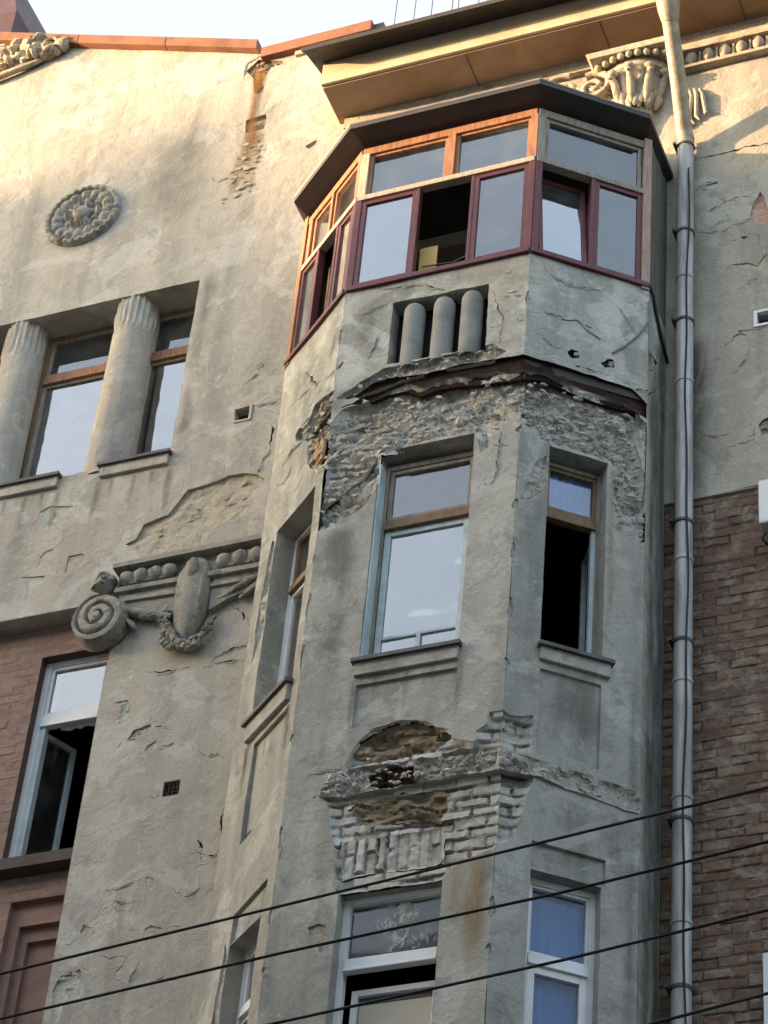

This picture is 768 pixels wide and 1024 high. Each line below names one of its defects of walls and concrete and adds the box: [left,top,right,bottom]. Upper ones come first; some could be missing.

spalling [246,60,285,94]
spalling [220,114,266,204]
crack [695,143,768,241]
flaking render [750,192,768,225]
crack [534,265,658,395]
crack [725,325,766,370]
spalling [295,271,646,543]
crack [484,431,508,485]
peeling [126,473,265,556]
flaking render [320,710,534,895]
crack [173,808,224,897]
crack [63,879,177,984]